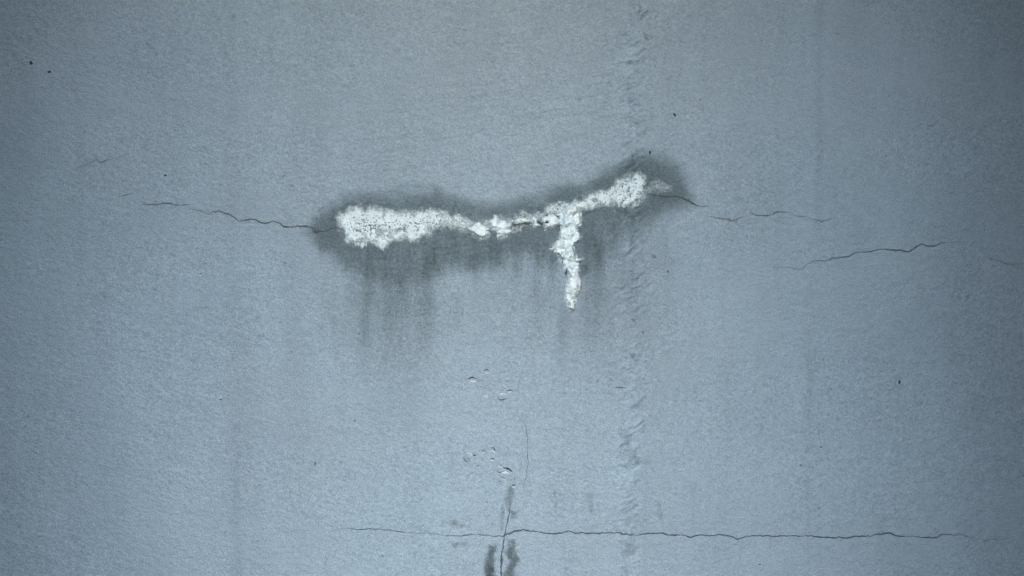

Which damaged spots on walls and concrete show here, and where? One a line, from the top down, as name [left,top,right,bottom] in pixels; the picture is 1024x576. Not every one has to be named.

crack [118,193,340,233]
crack [647,193,831,222]
water stain [337,174,657,311]
crack [793,241,1013,270]
crack [336,371,1009,576]